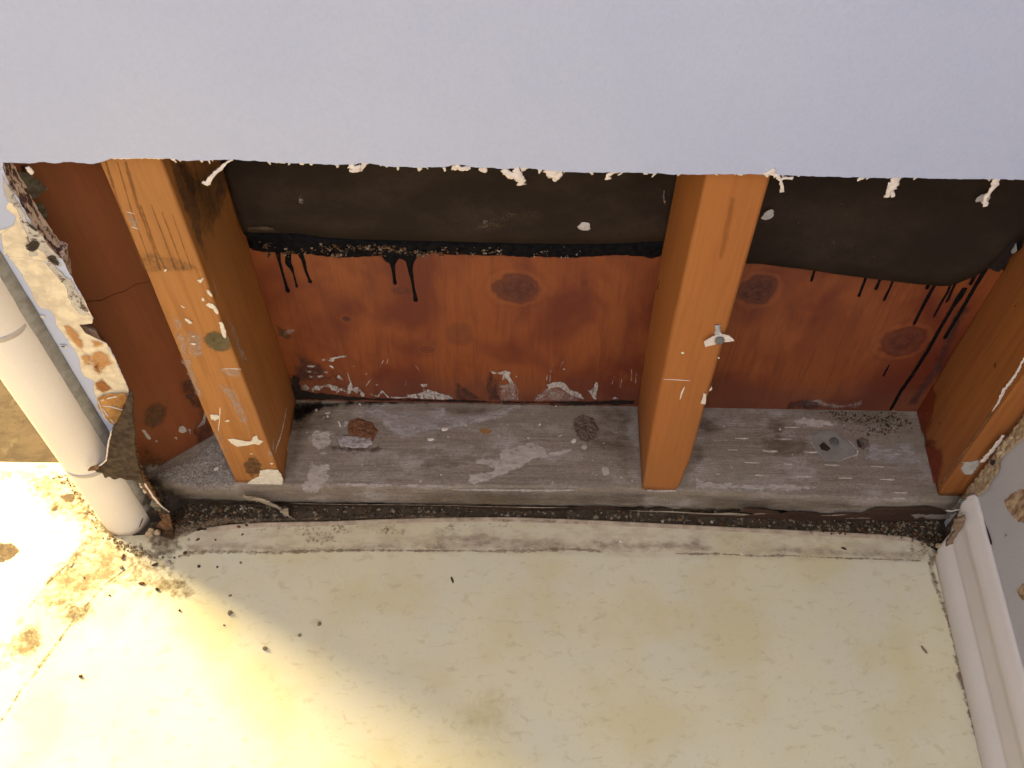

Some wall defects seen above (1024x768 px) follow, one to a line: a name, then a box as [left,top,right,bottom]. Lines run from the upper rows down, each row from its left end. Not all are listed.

water stain [390,260,418,302]
water stain [867,269,988,482]
flaking render [1004,489,1024,523]